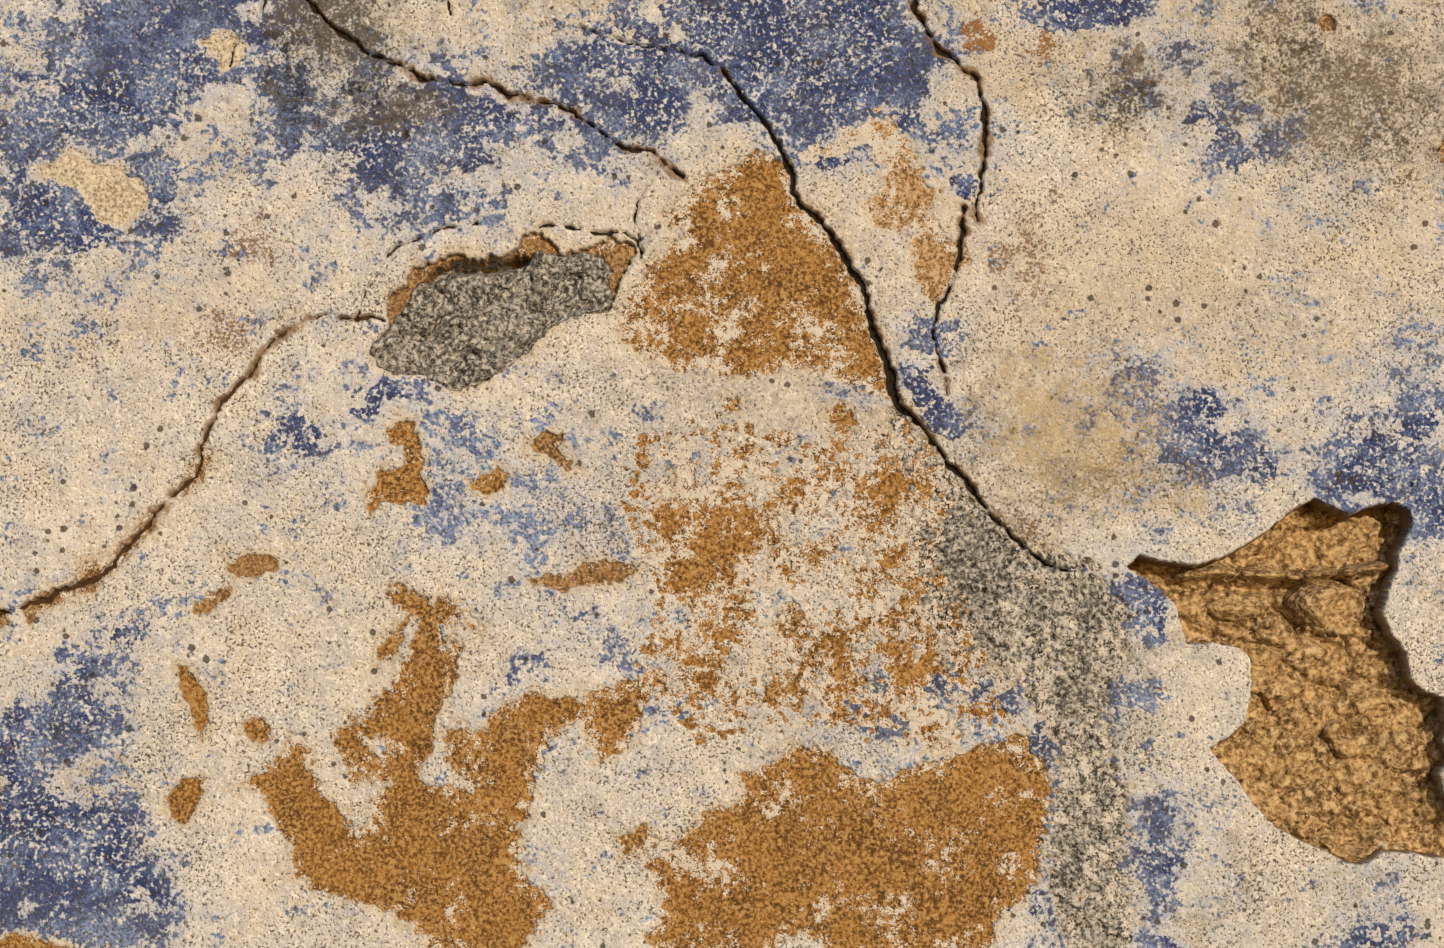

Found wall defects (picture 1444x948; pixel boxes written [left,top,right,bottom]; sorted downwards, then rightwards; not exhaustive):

peeling [1,148,200,255]
peeling [0,33,244,143]
crack [229,0,267,67]
peeling [316,74,532,219]
crack [306,0,685,259]
peeling [544,0,978,305]
peeling [1018,0,1151,35]
peeling [1182,109,1256,175]
crack [581,0,1068,572]
crack [0,222,479,615]
flaking render [243,150,1444,948]
flaking render [0,933,68,948]